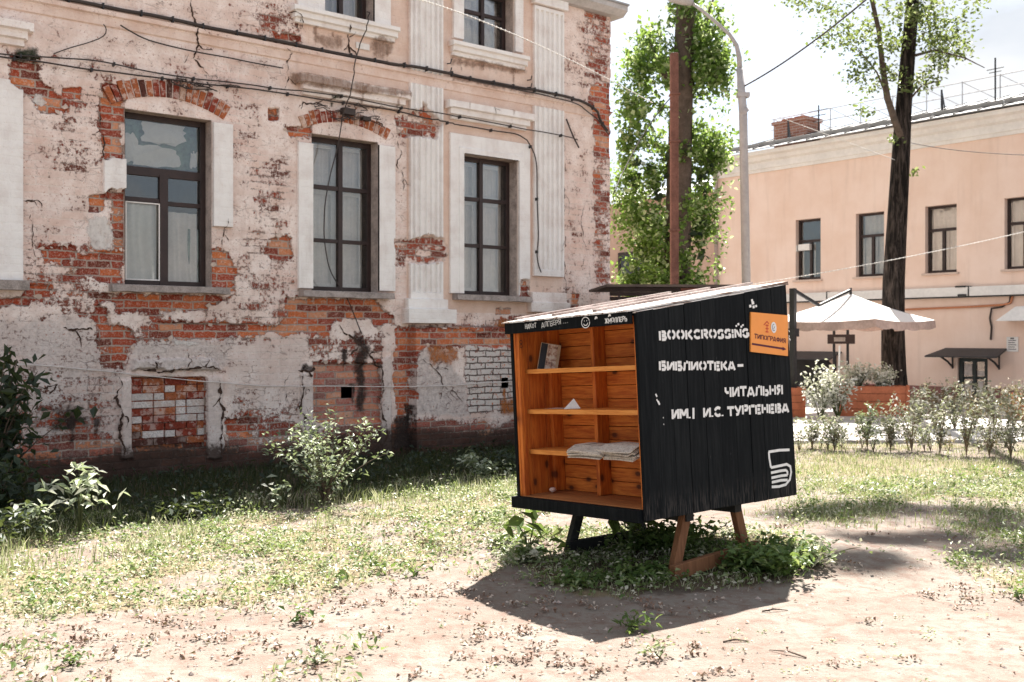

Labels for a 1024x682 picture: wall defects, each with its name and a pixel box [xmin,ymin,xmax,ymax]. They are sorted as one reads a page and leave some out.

spalling [9,56,81,114]
spalling [96,83,125,160]
spalling [268,108,313,139]
spalling [581,10,612,286]
spalling [0,284,53,308]
spalling [38,188,511,449]
crack [113,353,229,456]
crack [280,367,316,444]